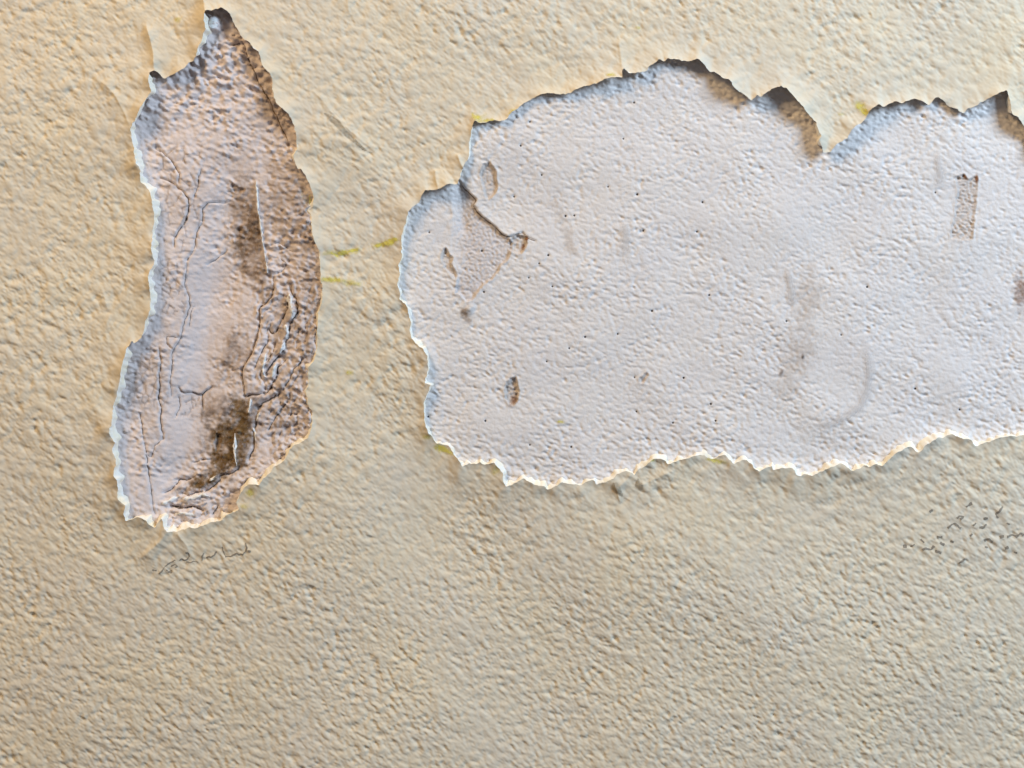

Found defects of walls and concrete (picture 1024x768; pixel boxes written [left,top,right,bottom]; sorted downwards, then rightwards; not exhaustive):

crack [156,149,224,418]
peeling [109,7,323,571]
damp [190,399,252,488]
crack [165,243,303,514]
damp [236,212,260,257]
peeling [397,58,1024,501]